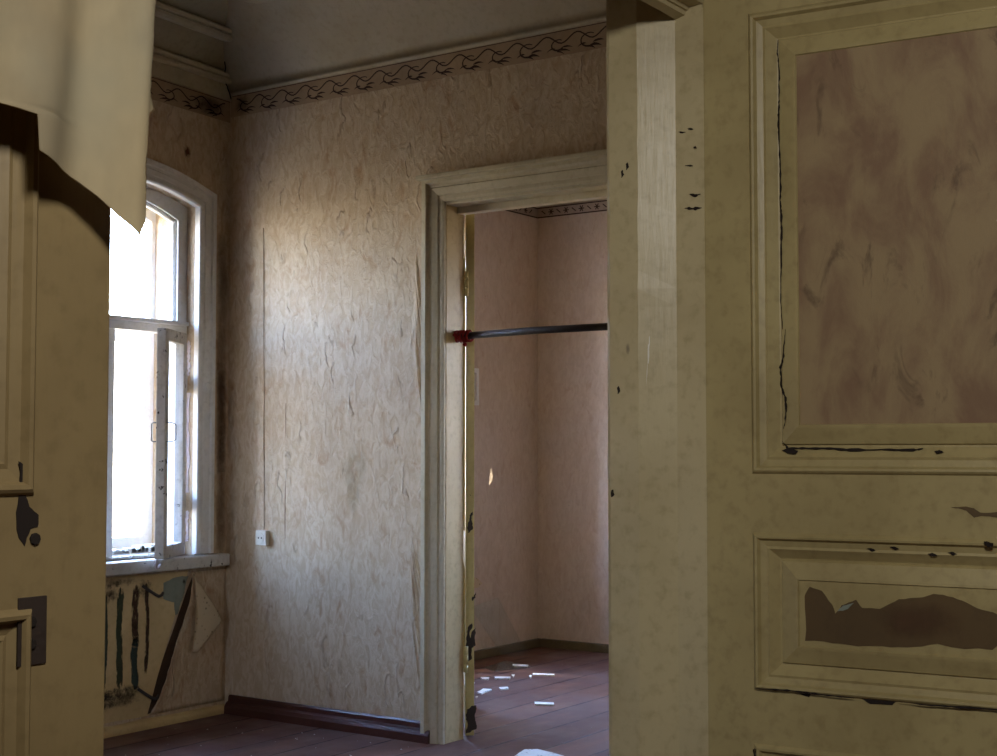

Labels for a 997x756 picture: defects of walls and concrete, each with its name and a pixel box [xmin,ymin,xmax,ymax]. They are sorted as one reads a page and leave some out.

peeling [952,506,997,518]
peeling [104,570,188,724]
peeling [805,587,997,650]